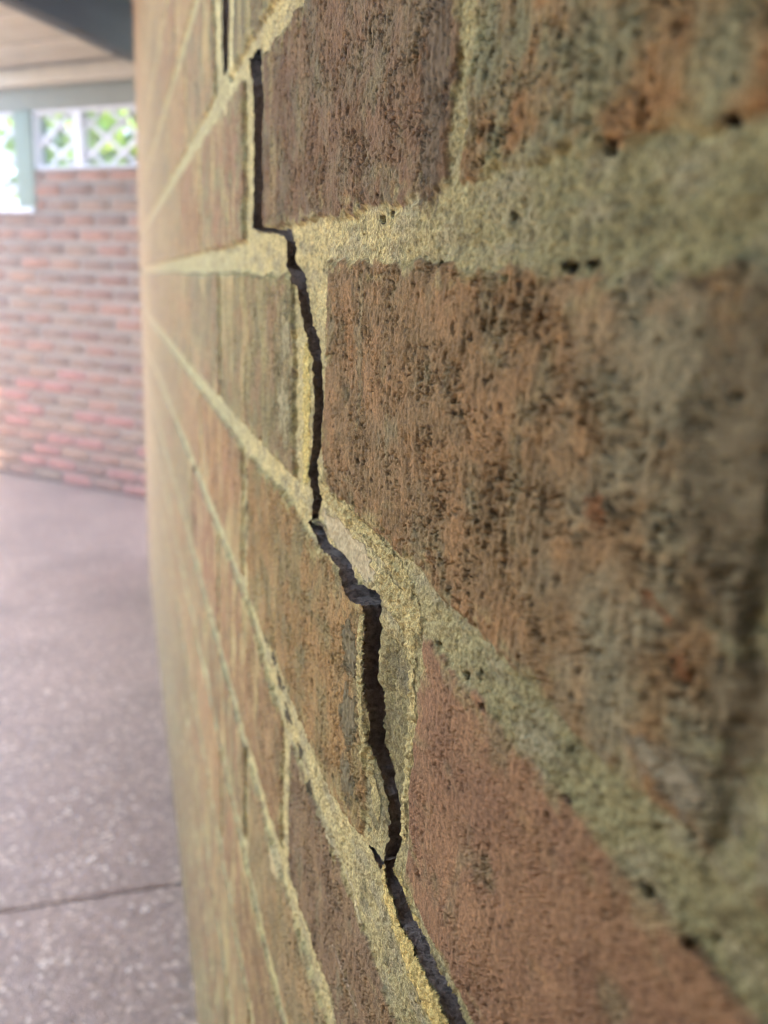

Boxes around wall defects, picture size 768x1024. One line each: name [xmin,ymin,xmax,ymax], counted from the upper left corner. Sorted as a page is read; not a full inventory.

crack [222,0,467,1024]